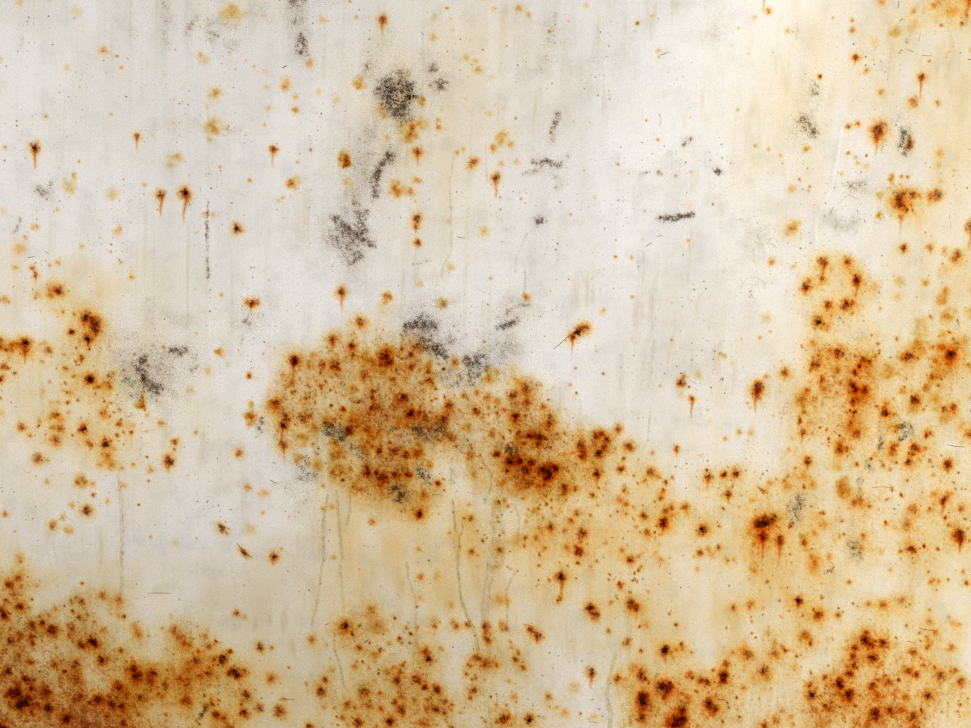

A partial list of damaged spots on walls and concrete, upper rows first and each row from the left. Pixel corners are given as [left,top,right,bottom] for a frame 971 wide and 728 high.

damp [375,70,419,137]
damp [371,152,395,198]
damp [330,200,374,265]
rust [65,311,99,369]
rust [340,348,480,492]
rust [487,385,576,499]
rust [820,348,871,437]
rust [754,514,792,544]
rust [0,576,167,728]
rust [636,670,679,723]
rust [688,661,737,711]
rust [808,631,942,728]